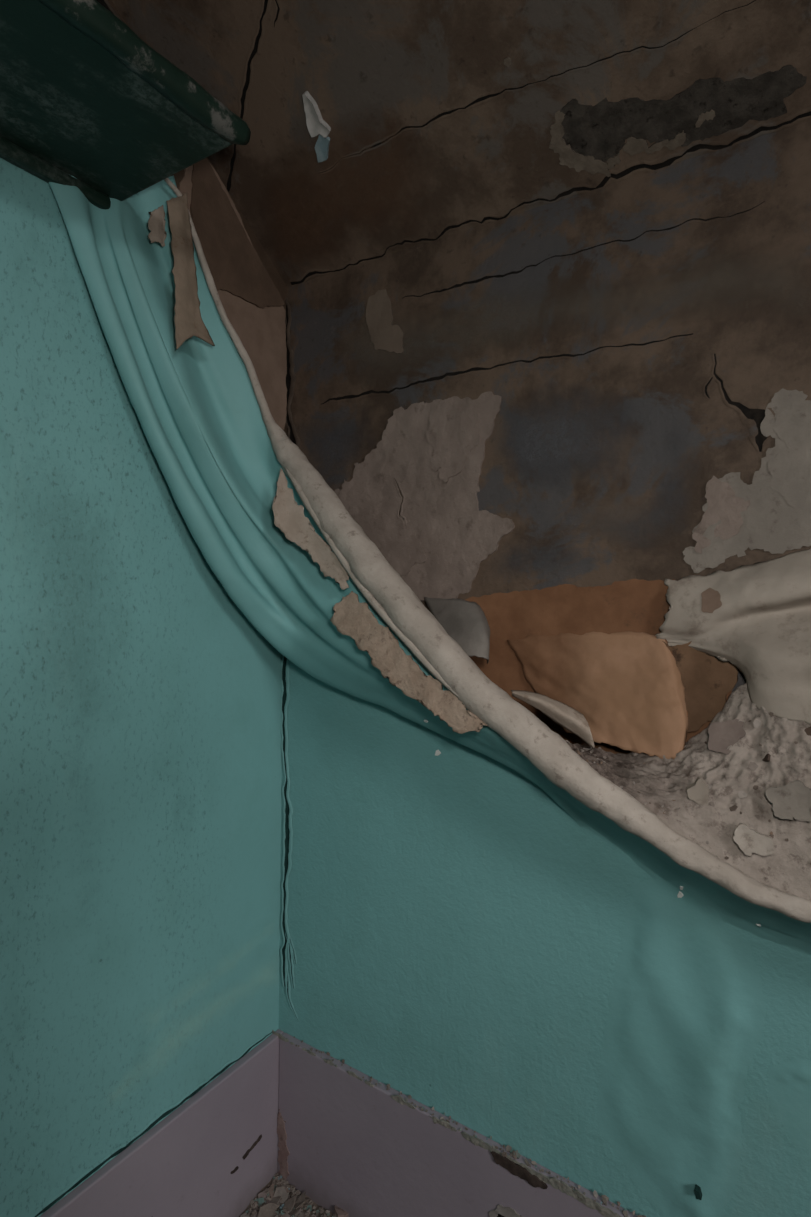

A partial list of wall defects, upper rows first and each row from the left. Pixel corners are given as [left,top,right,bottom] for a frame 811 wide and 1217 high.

crack [224,0,282,195]
peeling [302,91,331,163]
spalling [549,65,807,177]
crack [285,107,811,452]
flaking render [334,391,515,600]
flaking render [683,388,811,573]
crack [280,655,299,1020]
spalling [272,1030,646,1217]